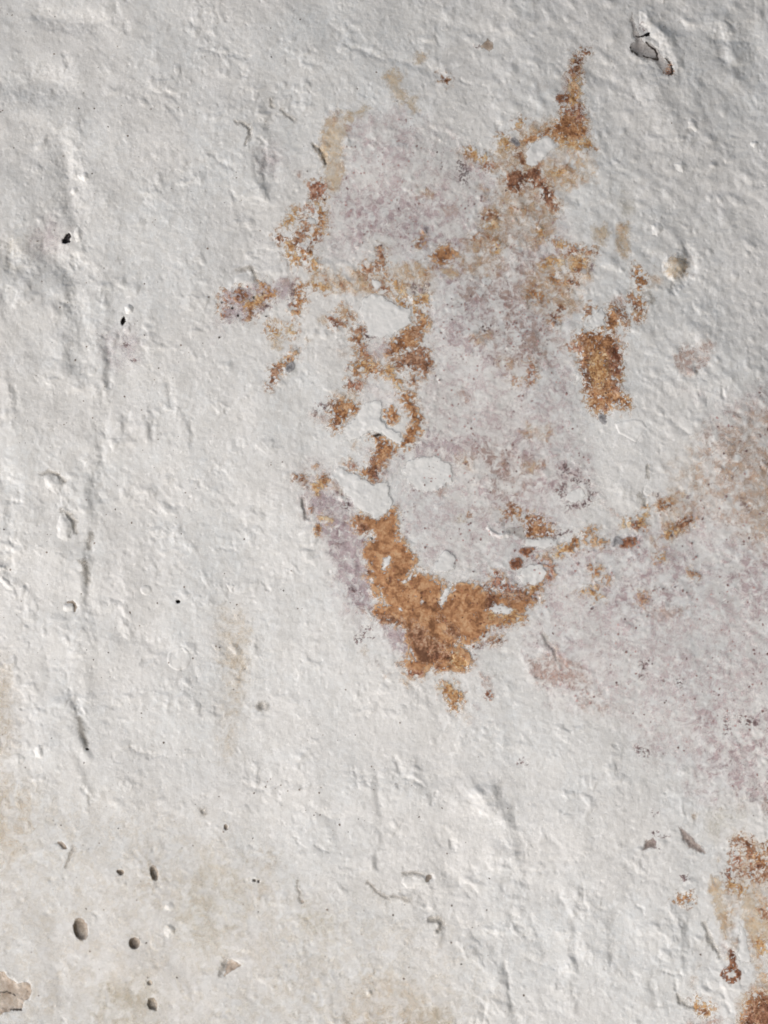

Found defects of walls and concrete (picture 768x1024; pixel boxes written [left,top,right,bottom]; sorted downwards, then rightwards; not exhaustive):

spalling [630,16,675,75]
corrosion [217,47,649,484]
corrosion [292,463,339,537]
corrosion [347,493,698,713]
corrosion [694,997,717,1024]
corrosion [708,835,768,1024]